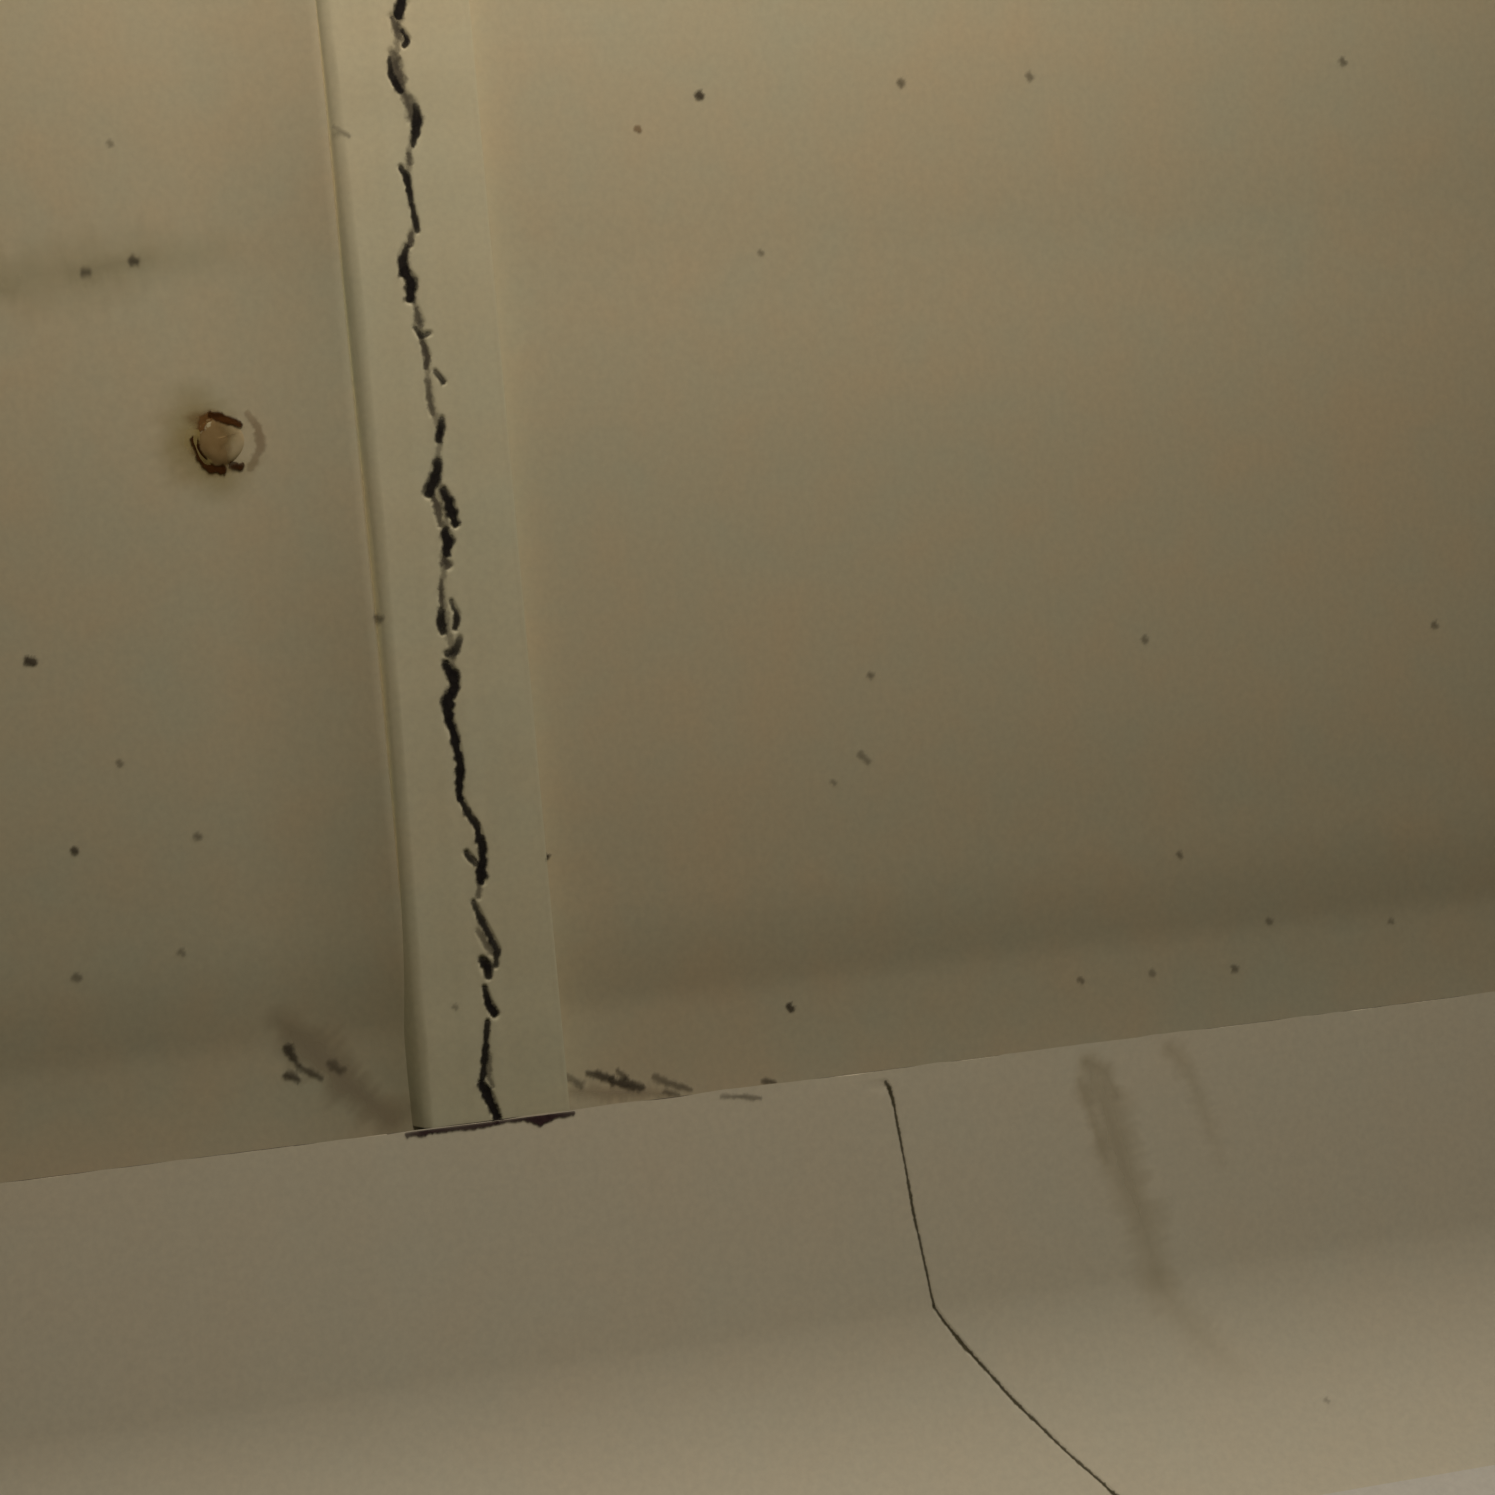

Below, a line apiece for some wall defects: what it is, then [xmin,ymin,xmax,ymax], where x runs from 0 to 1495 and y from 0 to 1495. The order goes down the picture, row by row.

corrosion [185,411,245,474]
crack [388,0,575,1138]
crack [885,1081,1117,1495]